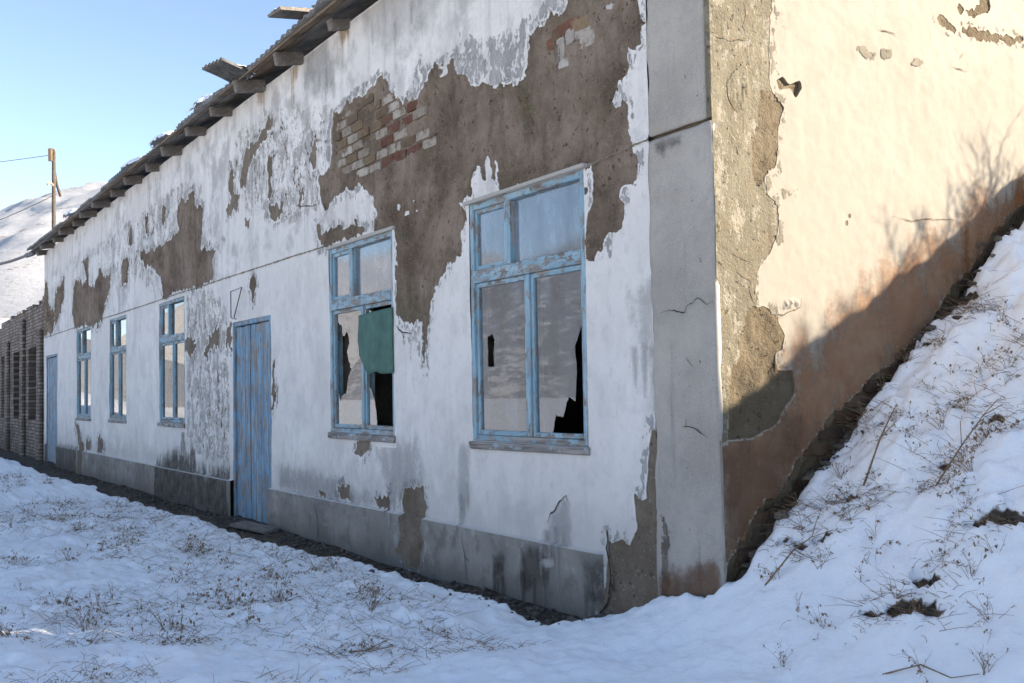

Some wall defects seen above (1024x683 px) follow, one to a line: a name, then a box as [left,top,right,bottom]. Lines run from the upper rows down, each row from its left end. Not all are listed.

flaking render [932,0,1024,48]
flaking render [226,0,646,377]
flaking render [752,78,798,188]
flaking render [43,183,233,462]
flaking render [375,479,429,574]
flaking render [593,415,658,615]